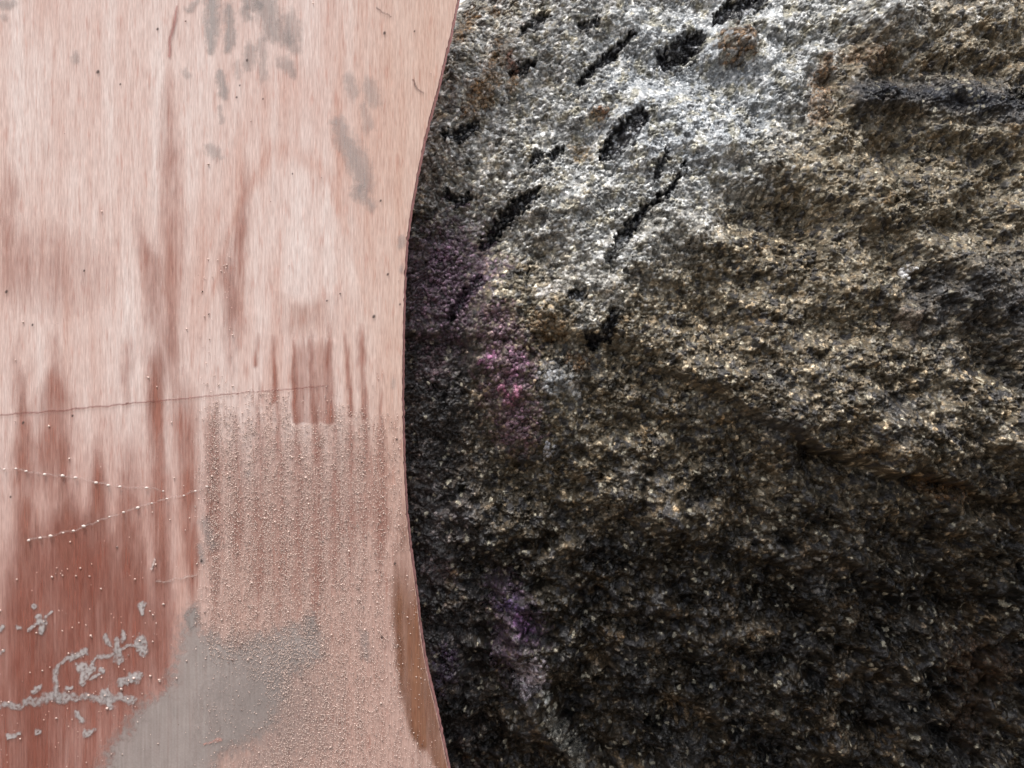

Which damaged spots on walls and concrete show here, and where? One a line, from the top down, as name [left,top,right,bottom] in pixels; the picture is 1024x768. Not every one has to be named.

leakage [153,383,165,576]
leakage [183,467,197,582]
leakage [0,519,144,768]